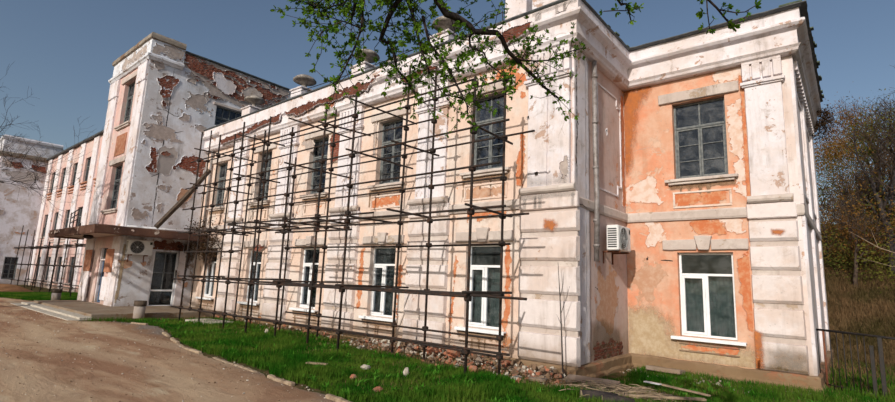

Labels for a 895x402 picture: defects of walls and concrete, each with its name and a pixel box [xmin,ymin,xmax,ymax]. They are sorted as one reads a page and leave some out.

flaking render [121,41,381,178]
peeling [515,131,539,187]
peeling [619,67,751,208]
peeling [131,203,163,232]
peeling [372,195,400,208]
peeling [466,185,505,199]
peeling [689,218,747,236]
peeling [356,248,366,309]
peeling [501,245,513,346]
peeling [593,222,668,361]
peeling [736,250,753,332]